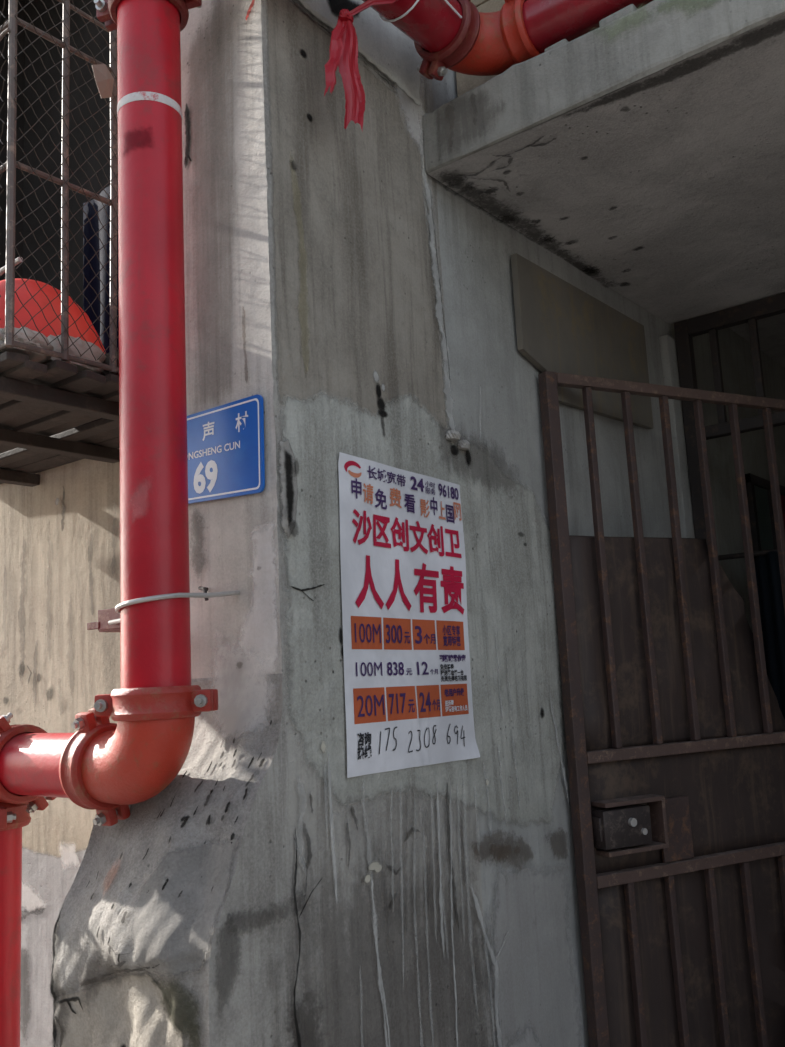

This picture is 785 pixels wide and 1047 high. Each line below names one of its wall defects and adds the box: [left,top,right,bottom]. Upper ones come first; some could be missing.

damp [566,20,785,116]
crack [459,136,556,191]
damp [440,170,630,287]
crack [293,829,322,1047]
damp [437,784,459,1047]
damp [379,960,391,1047]